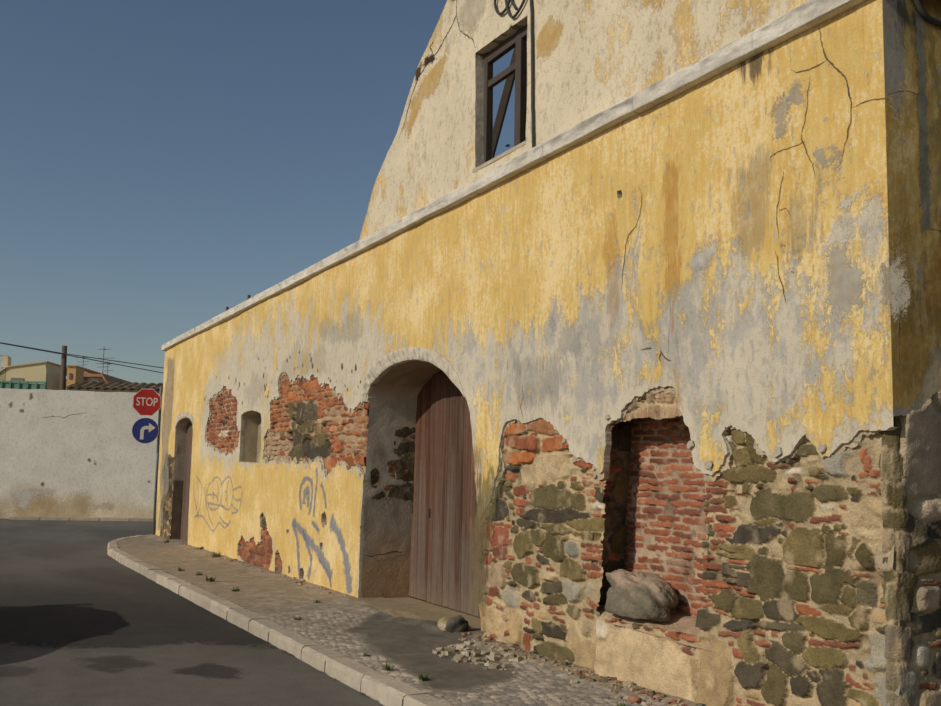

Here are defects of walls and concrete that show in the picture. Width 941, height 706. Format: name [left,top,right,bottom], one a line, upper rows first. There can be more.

crack [399,0,474,137]
crack [768,29,919,303]
crack [621,186,642,287]
spalling [204,376,245,456]
spalling [263,351,415,501]
spalling [160,455,175,539]
spalling [238,514,282,573]
spalling [479,386,941,706]